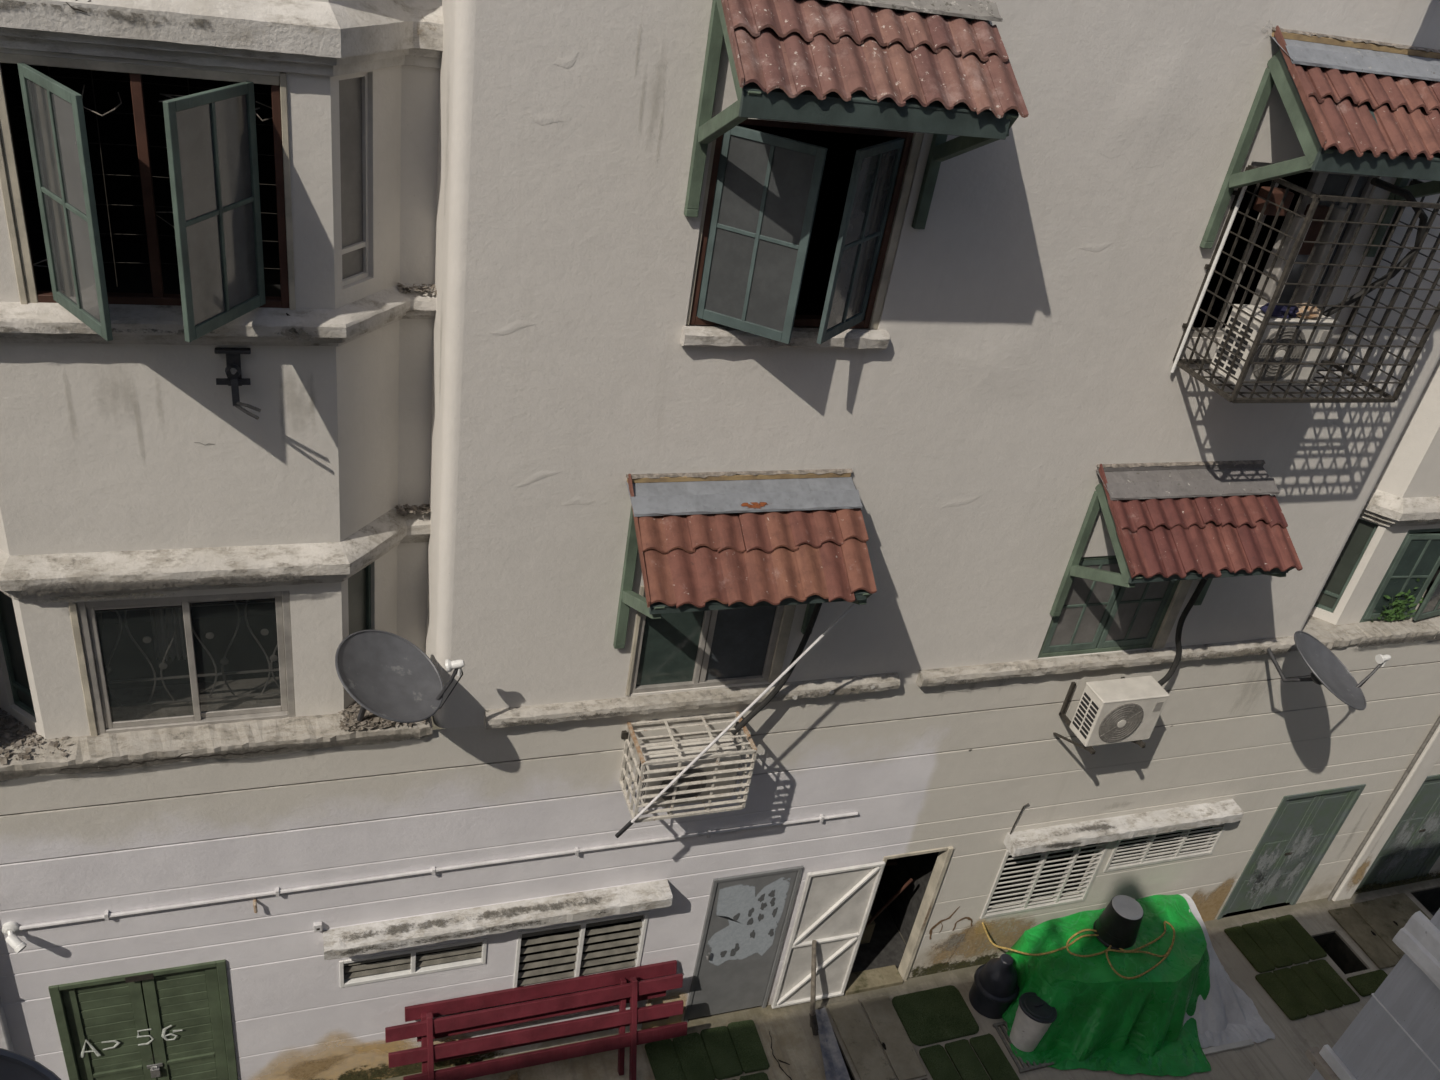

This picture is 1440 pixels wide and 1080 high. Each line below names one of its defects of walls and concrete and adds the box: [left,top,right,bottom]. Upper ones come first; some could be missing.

damp [263,1043,400,1080]